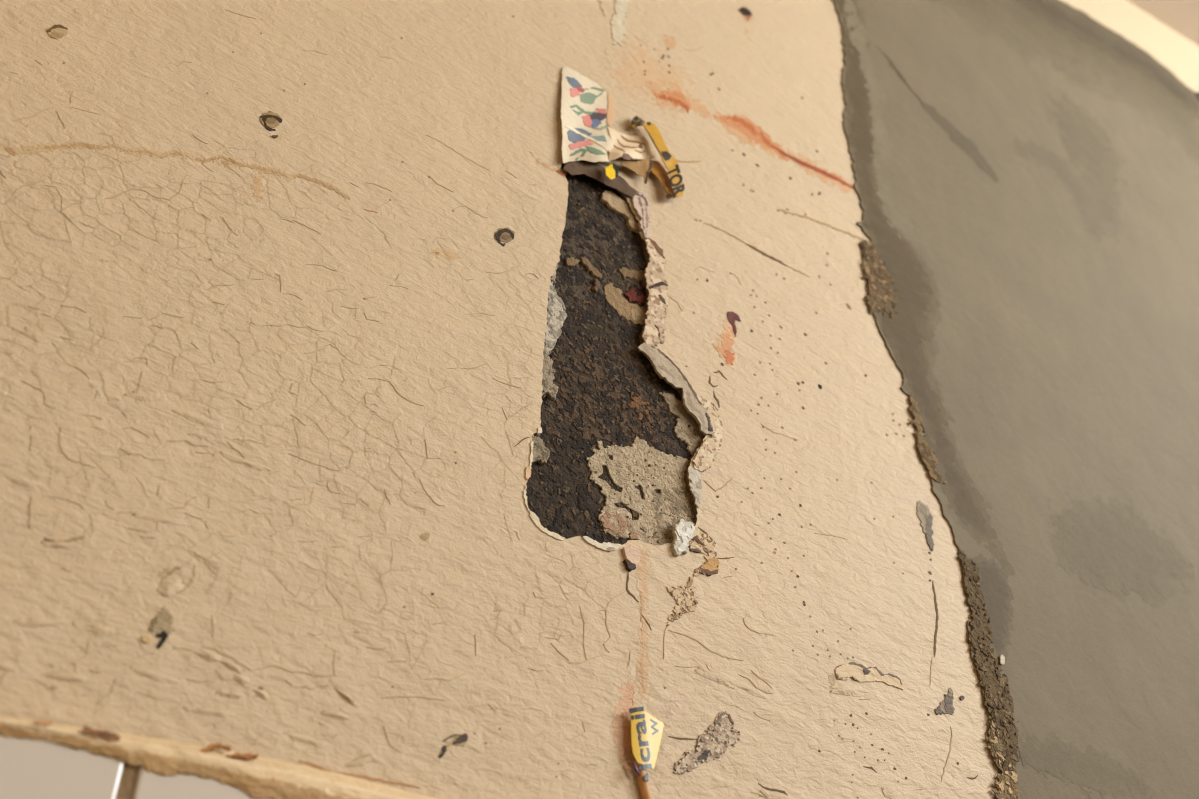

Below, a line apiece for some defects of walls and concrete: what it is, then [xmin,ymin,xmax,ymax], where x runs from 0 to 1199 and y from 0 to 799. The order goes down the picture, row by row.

rust [605,30,856,197]
crack [704,222,809,277]
crack [779,209,864,241]
flaking render [526,167,719,626]
crack [0,92,774,789]
spalling [828,662,904,690]
spalling [673,711,741,774]
crack [710,783,788,799]